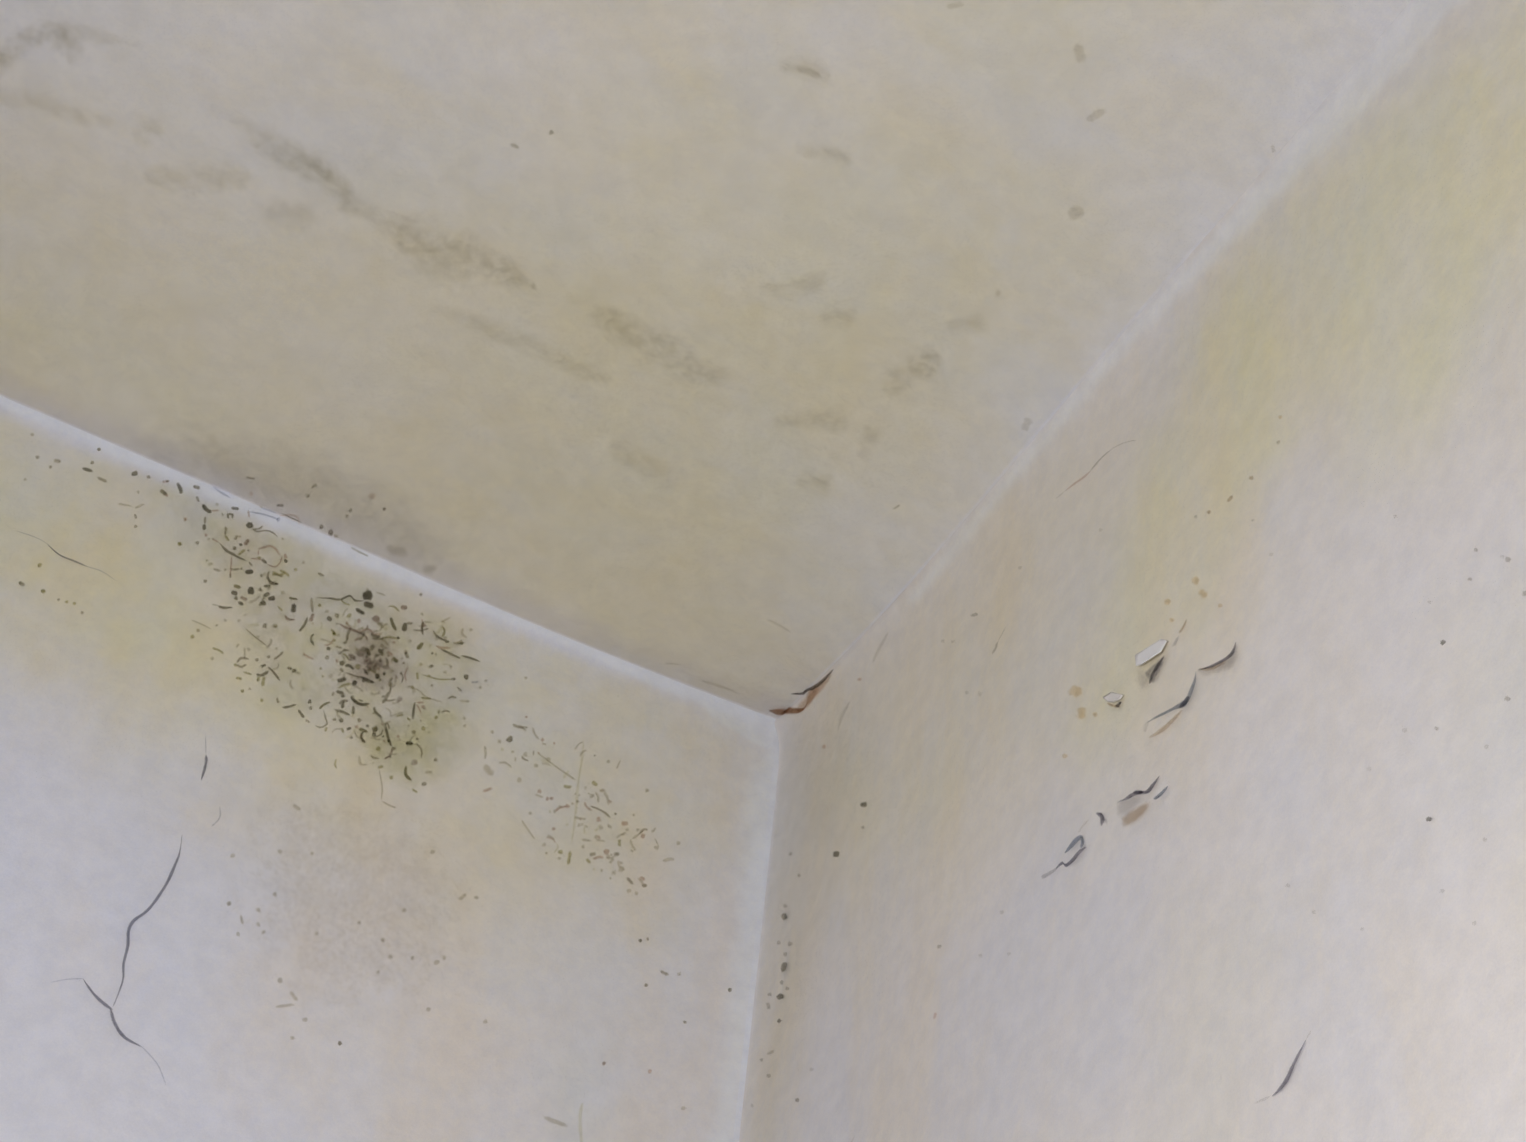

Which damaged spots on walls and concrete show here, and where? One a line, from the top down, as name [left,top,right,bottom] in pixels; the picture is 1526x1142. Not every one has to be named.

water stain [161,484,478,745]
peeling [1135,639,1167,682]
peeling [1119,778,1158,802]